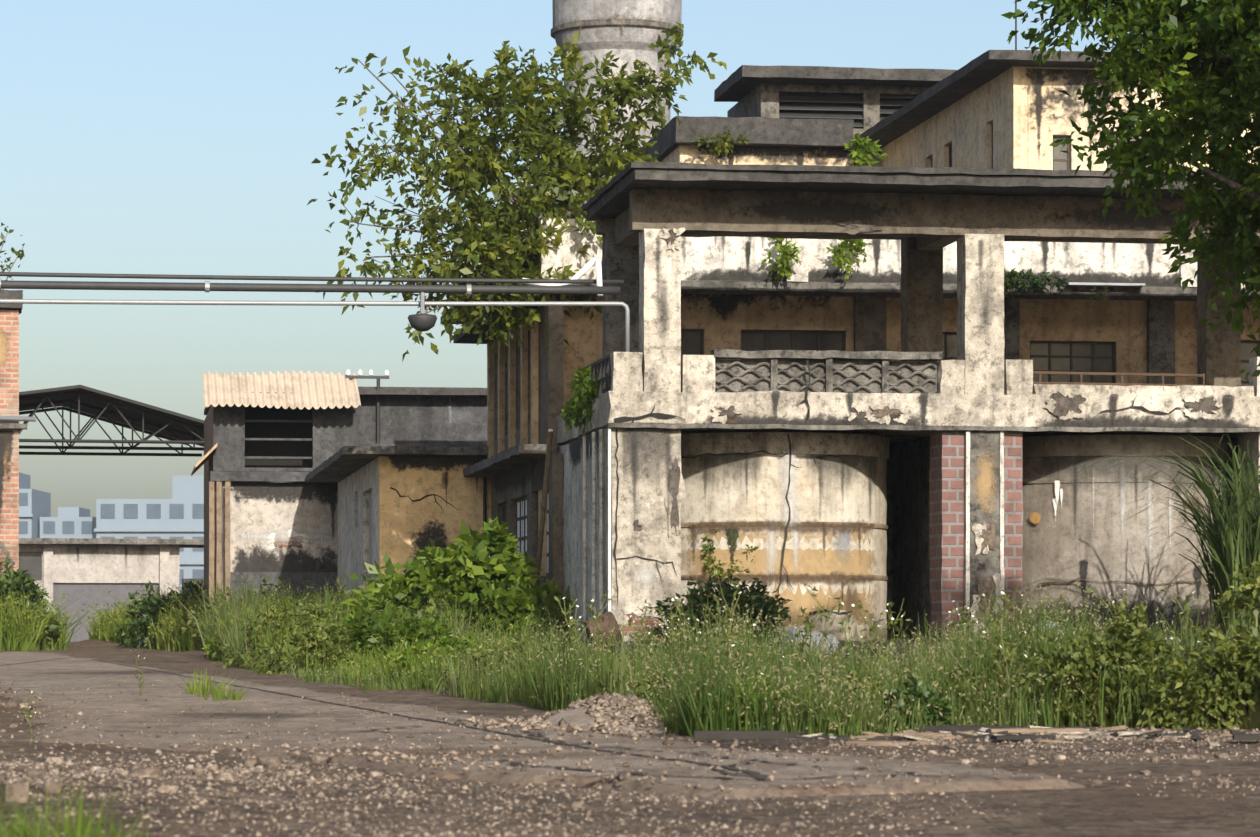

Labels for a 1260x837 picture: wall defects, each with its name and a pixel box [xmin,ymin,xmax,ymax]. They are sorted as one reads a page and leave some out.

leakage [0,431,14,515]
crack [613,404,685,604]
crack [681,360,855,625]
leakage [686,448,877,626]
spalling [1044,387,1088,420]
spalling [1183,396,1223,420]